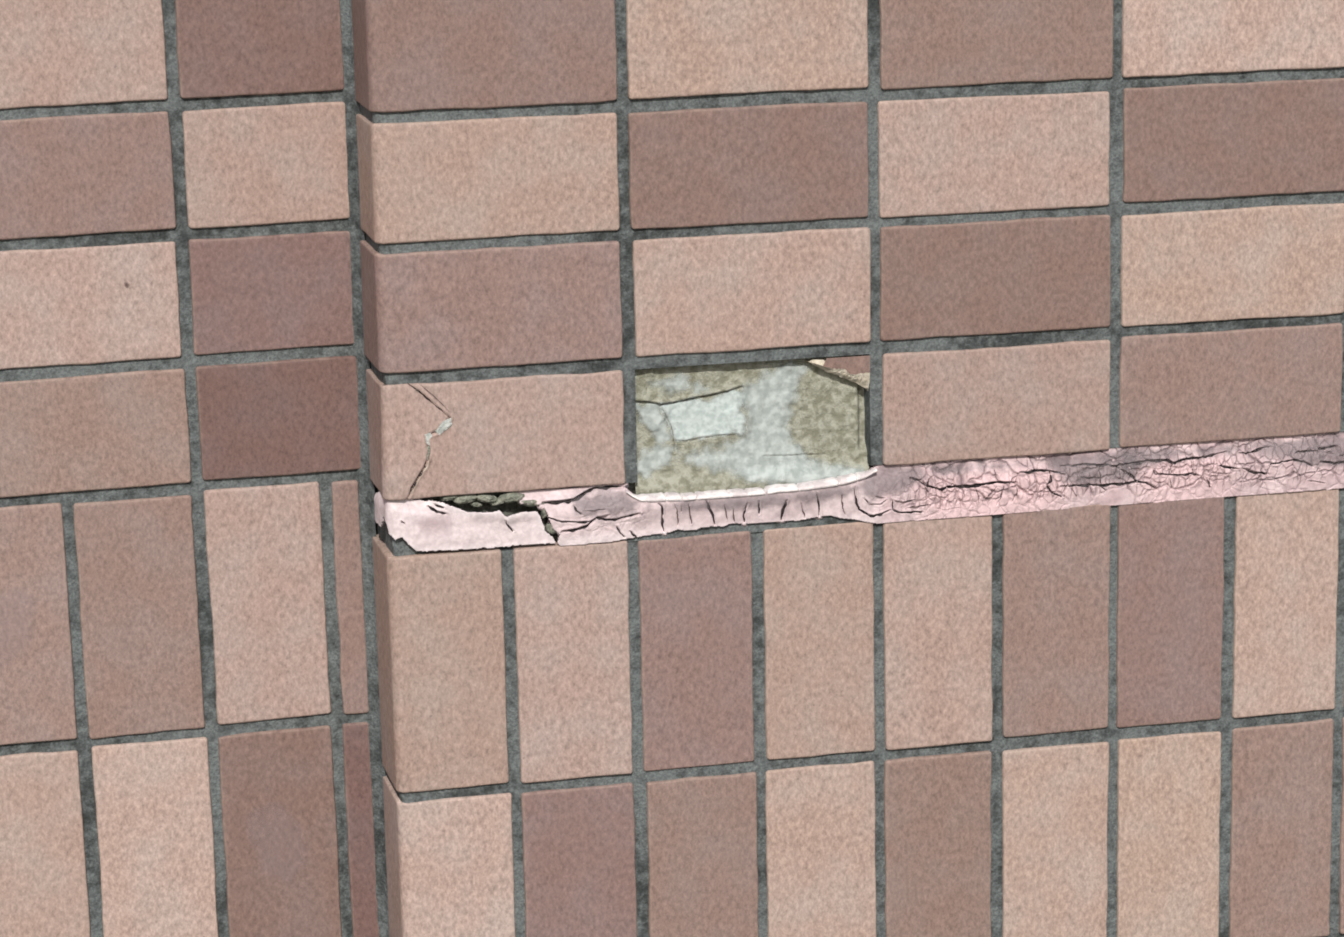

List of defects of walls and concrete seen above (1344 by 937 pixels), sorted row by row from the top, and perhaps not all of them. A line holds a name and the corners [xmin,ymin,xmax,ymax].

crack [407,383,452,495]
peeling [374,492,555,552]
spalling [625,355,877,502]
crack [544,446,1344,537]